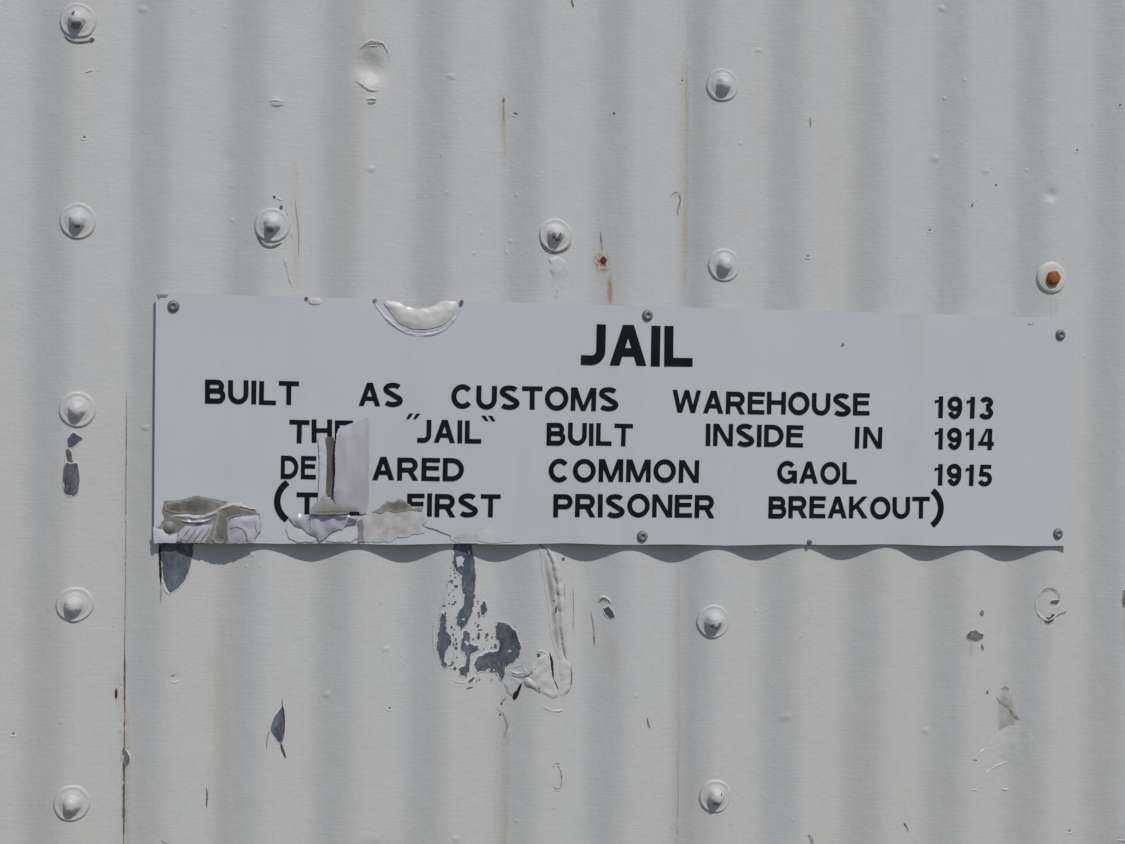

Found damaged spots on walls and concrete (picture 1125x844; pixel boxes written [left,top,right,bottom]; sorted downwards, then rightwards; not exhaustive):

peeling [62,431,84,498]
peeling [159,543,195,603]
peeling [432,544,574,716]
peeling [266,703,286,758]